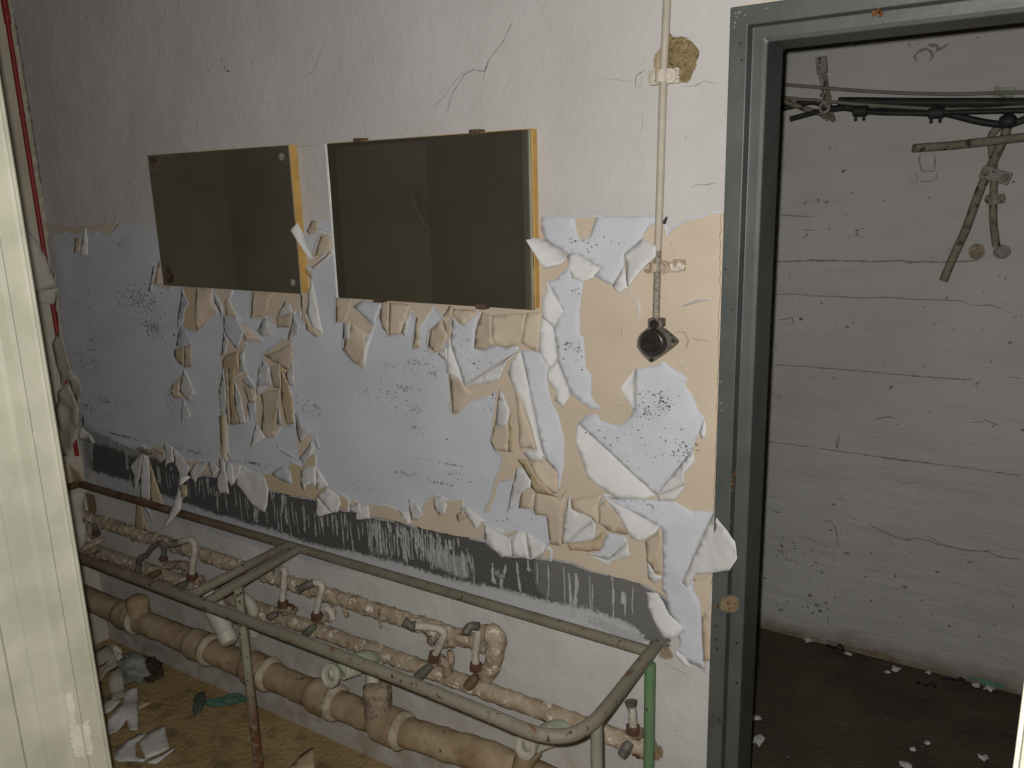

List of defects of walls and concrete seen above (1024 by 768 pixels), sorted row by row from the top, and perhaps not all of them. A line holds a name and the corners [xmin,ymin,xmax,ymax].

crack [431,22,513,113]
peeling [25,229,95,554]
peeling [48,221,121,255]
damp [69,277,644,641]
peeling [130,211,737,674]